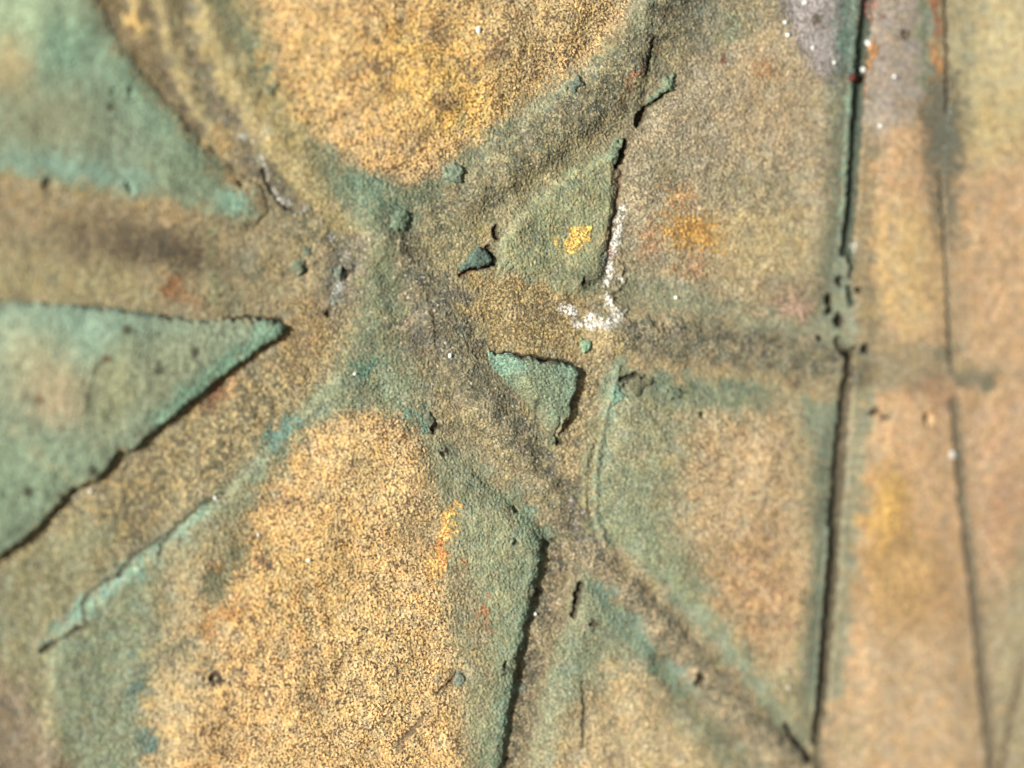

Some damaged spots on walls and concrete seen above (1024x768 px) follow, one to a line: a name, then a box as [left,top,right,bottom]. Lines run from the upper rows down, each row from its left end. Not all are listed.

crack [783,0,875,763]